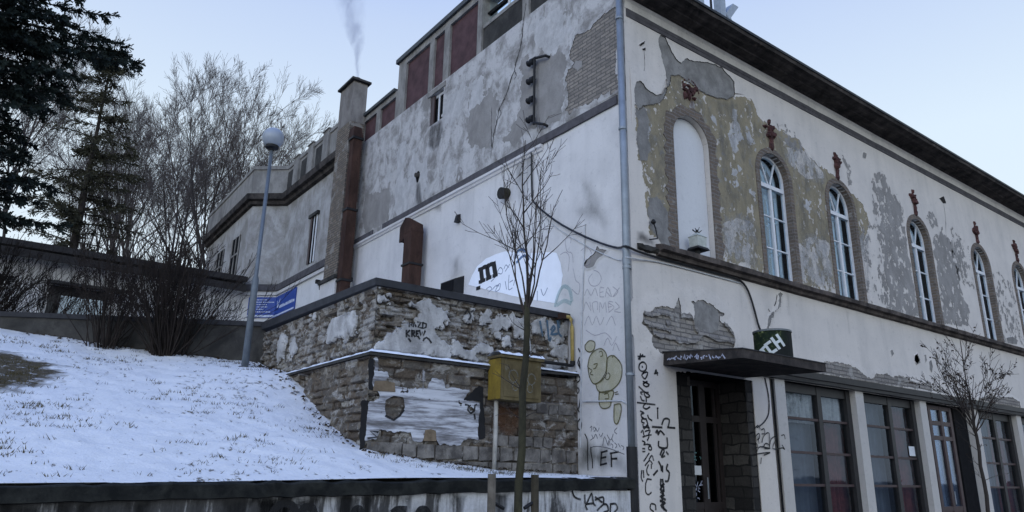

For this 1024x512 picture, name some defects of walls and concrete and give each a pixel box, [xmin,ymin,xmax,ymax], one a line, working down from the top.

crack [491,5,526,148]
peeling [465,0,919,317]
flaking render [309,310,360,345]
flaking render [376,287,392,305]
flaking render [365,297,568,446]
spalling [631,278,745,373]
peeling [926,196,975,326]